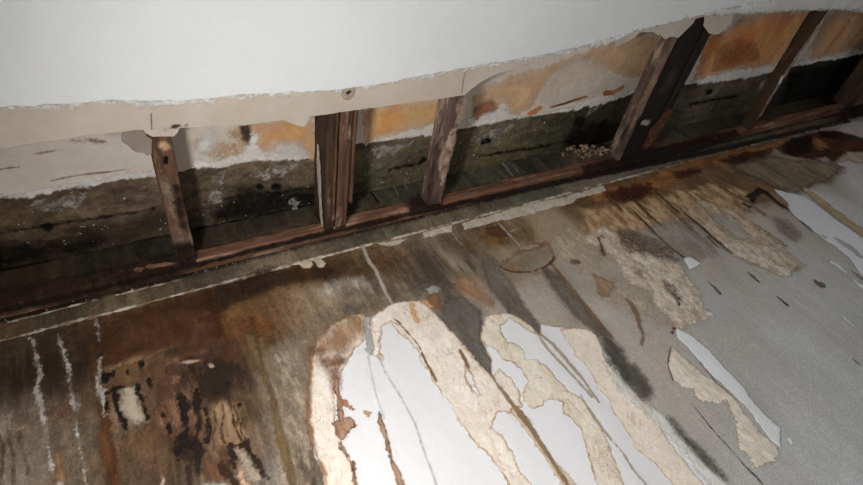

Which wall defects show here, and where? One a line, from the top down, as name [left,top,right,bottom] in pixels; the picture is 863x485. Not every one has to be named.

leakage [780,56,863,104]
leakage [205,125,251,158]
leakage [369,140,415,158]
leakage [567,106,618,149]
leakage [25,190,87,213]
leakage [208,160,314,224]
leakage [0,237,99,272]
flaking render [683,200,806,277]
flaking render [584,226,713,330]
leakage [94,266,329,485]
flaking render [119,386,146,424]